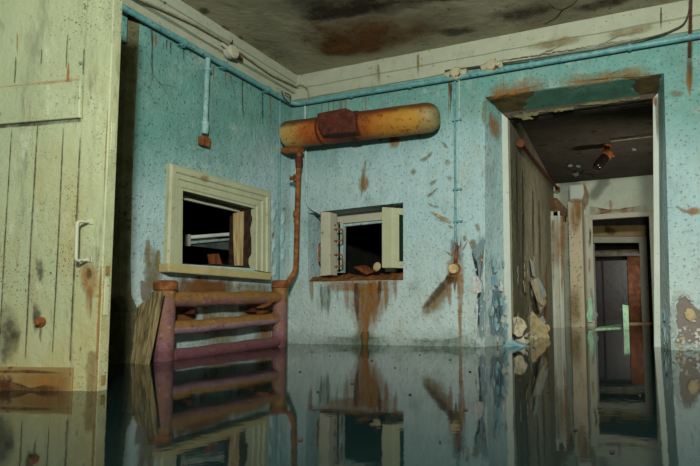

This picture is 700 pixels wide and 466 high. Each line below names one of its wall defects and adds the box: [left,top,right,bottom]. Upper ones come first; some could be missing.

water stain [297,0,425,54]
water stain [582,0,623,10]
peeling [486,74,662,120]
rust [333,281,388,343]
rust [447,274,463,334]
peeling [464,229,509,345]
spalling [660,290,700,350]